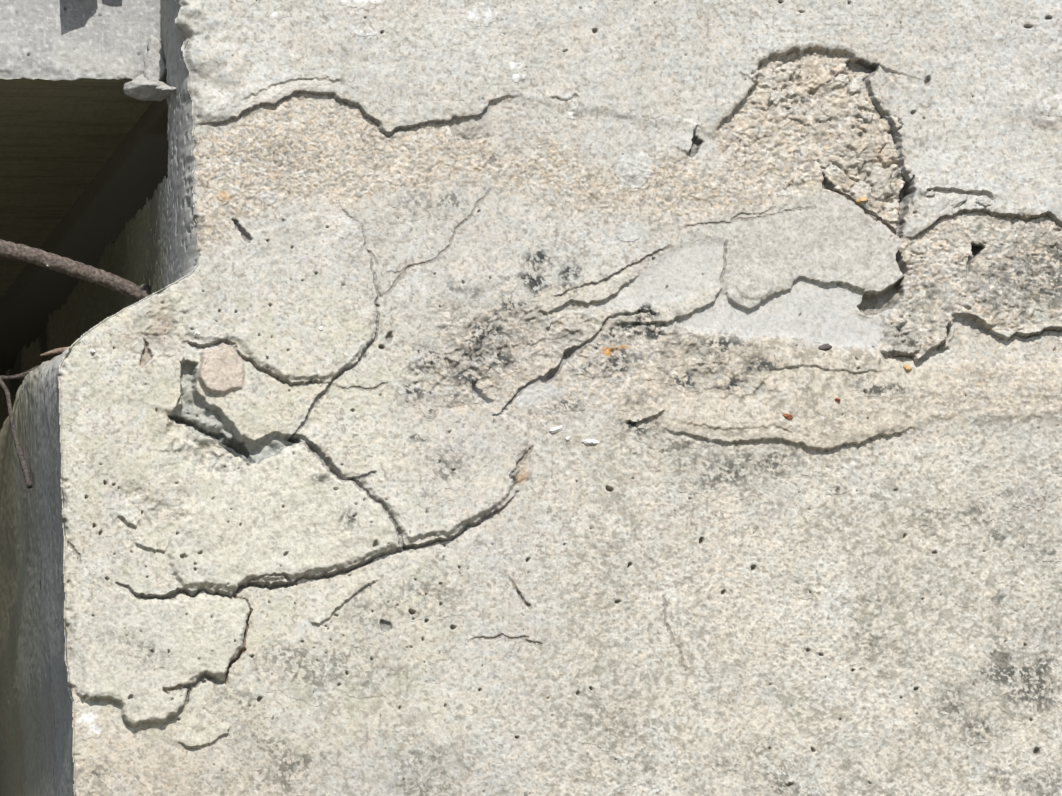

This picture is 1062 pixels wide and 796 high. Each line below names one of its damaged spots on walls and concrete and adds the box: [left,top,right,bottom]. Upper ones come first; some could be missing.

spalling [198,49,1062,358]
spalling [476,394,494,406]
peeling [515,383,565,409]
crack [115,188,543,704]
peeling [549,426,599,445]
peeling [627,406,924,451]